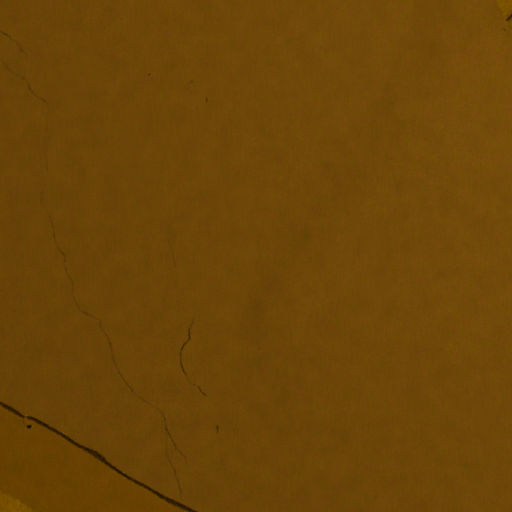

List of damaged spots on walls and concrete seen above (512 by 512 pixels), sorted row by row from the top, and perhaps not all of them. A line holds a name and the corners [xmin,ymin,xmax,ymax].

crack [0,402,196,512]